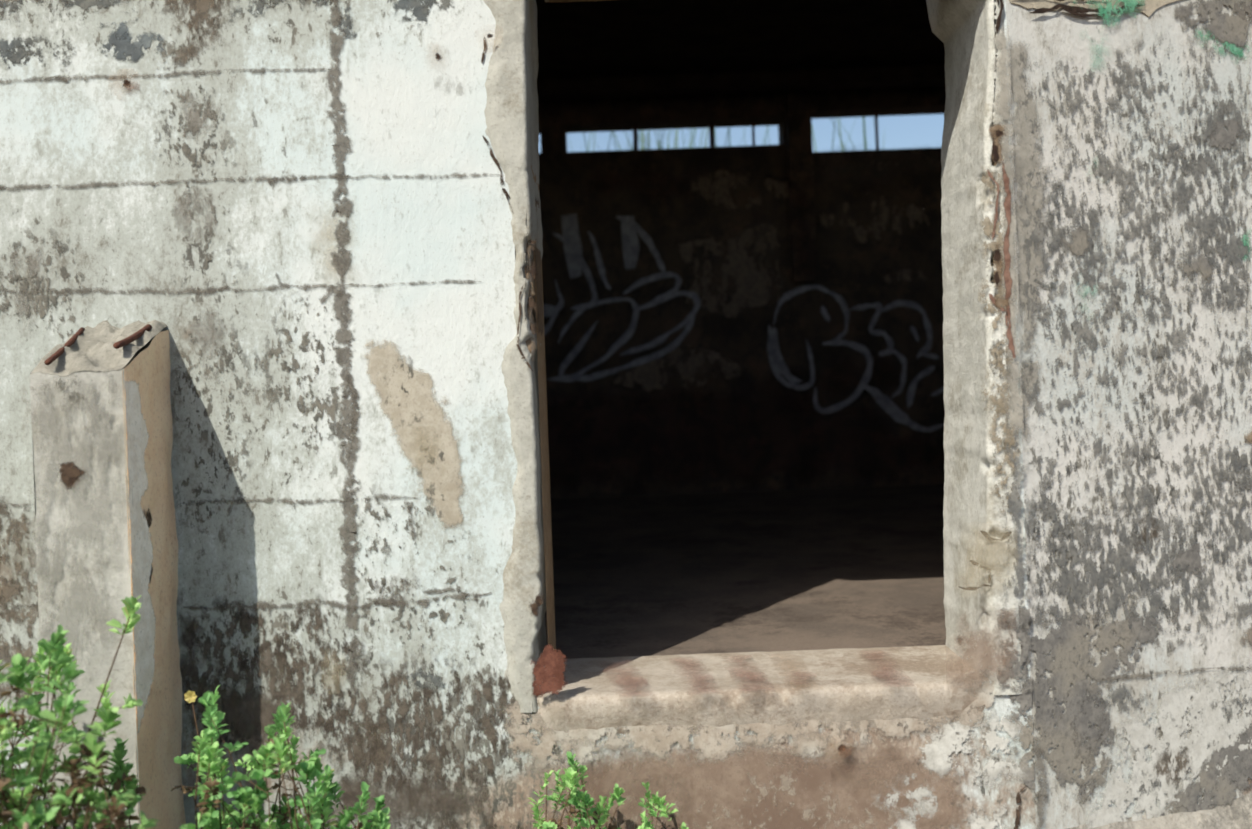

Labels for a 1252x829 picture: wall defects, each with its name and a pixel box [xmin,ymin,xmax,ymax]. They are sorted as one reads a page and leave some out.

rust [59,462,85,489]
peeling [365,340,463,528]
peeling [920,0,1252,829]
leakage [357,498,467,647]
rust [531,643,568,697]
leakage [180,602,1008,829]
peeling [622,774,938,829]
crack [1014,740,1048,829]